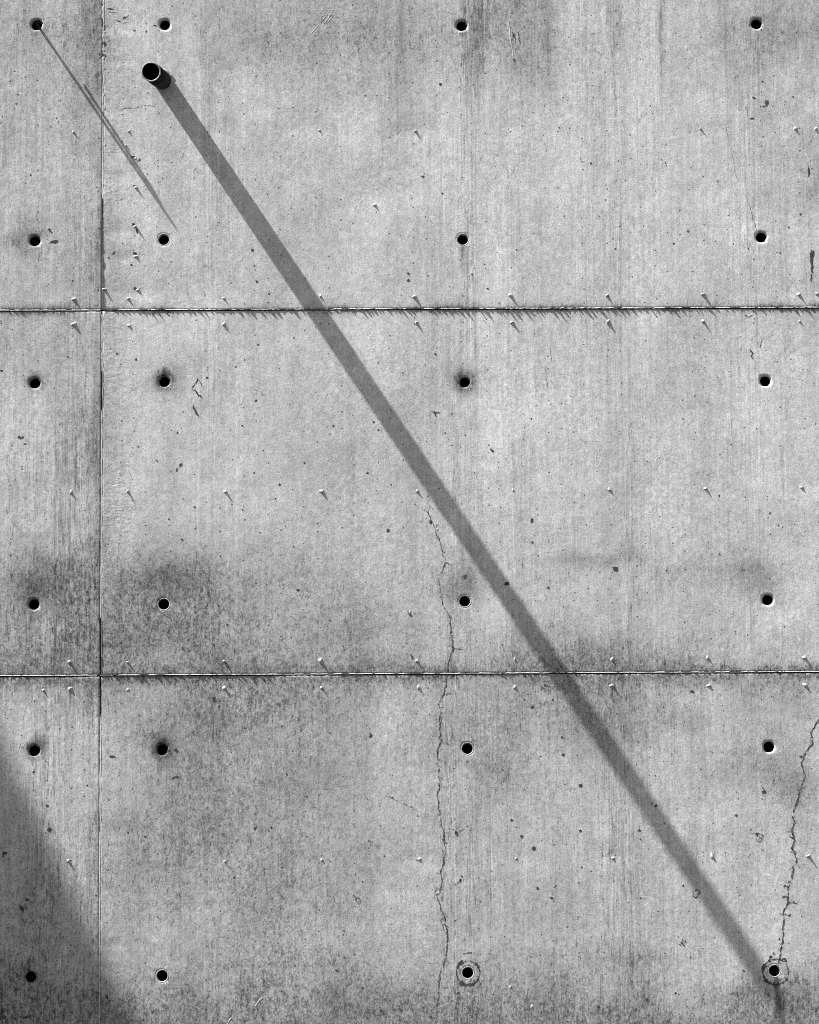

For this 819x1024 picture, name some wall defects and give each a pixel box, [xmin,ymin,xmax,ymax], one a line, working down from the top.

crack [386,506,462,1024]
crack [778,715,819,963]